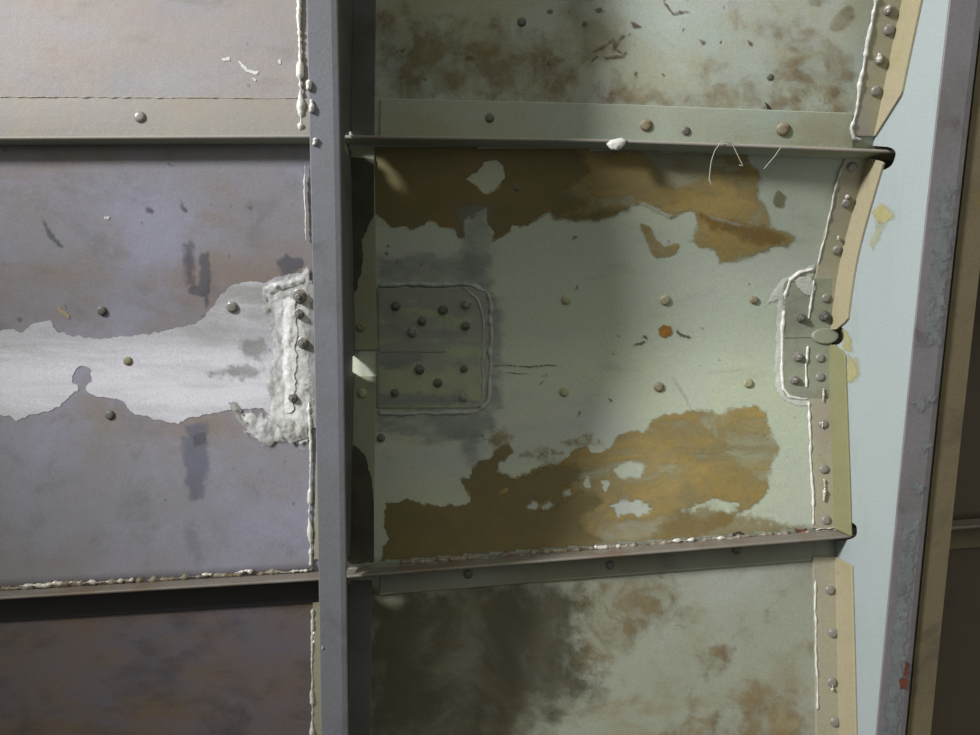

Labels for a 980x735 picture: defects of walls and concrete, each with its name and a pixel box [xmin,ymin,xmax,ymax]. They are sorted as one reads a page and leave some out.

peeling [0,272,310,424]
water stain [188,253,209,303]
rust [659,325,672,338]
water stain [370,585,606,735]